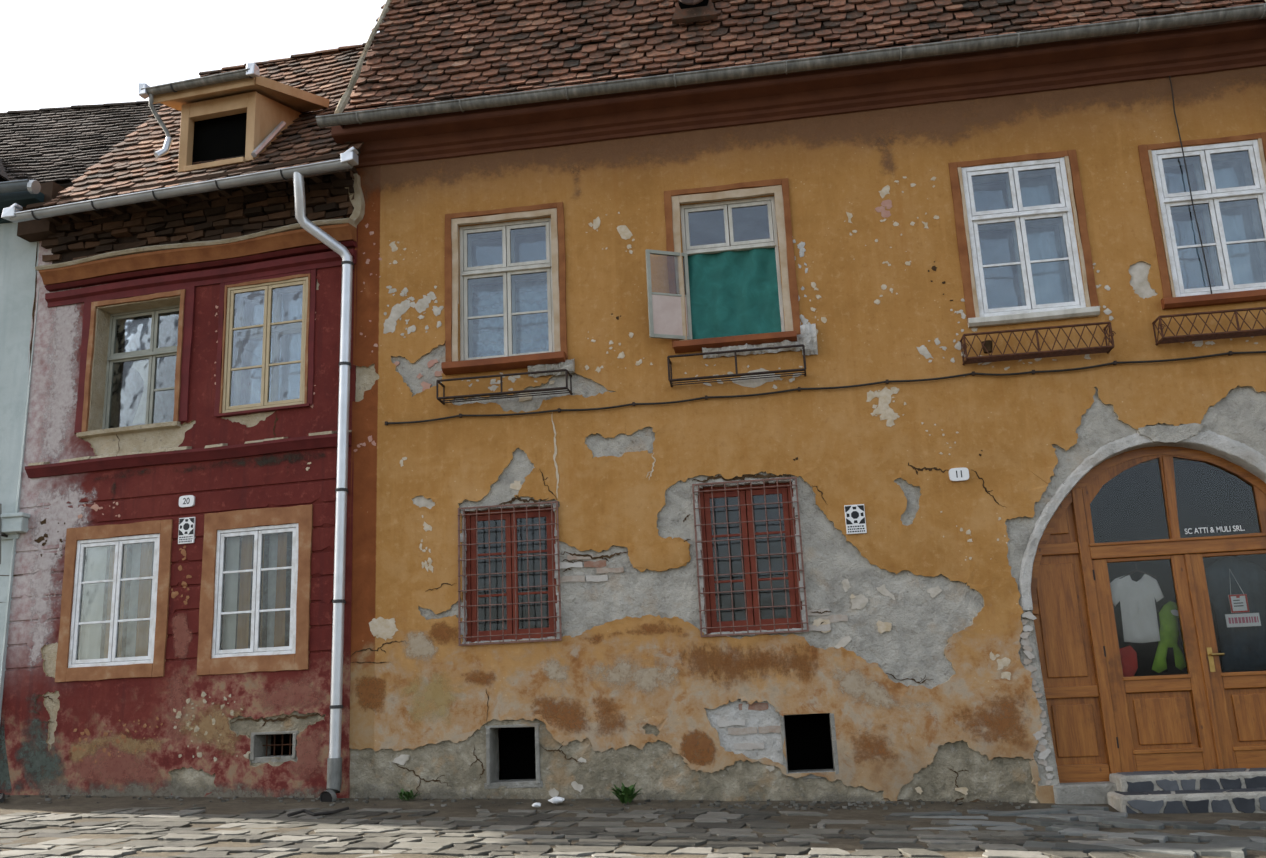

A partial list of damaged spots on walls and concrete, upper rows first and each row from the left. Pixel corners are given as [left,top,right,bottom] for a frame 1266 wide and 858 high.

flaking render [35,167,445,402]
flaking render [1128,262,1157,299]
flaking render [1199,386,1266,456]
crack [499,412,559,505]
crack [908,462,1007,508]
flaking render [349,387,1183,803]
damp [404,622,457,658]
flaking render [72,692,326,795]
damp [169,614,238,753]
damp [356,677,385,710]
damp [534,698,585,731]
damp [833,670,899,708]